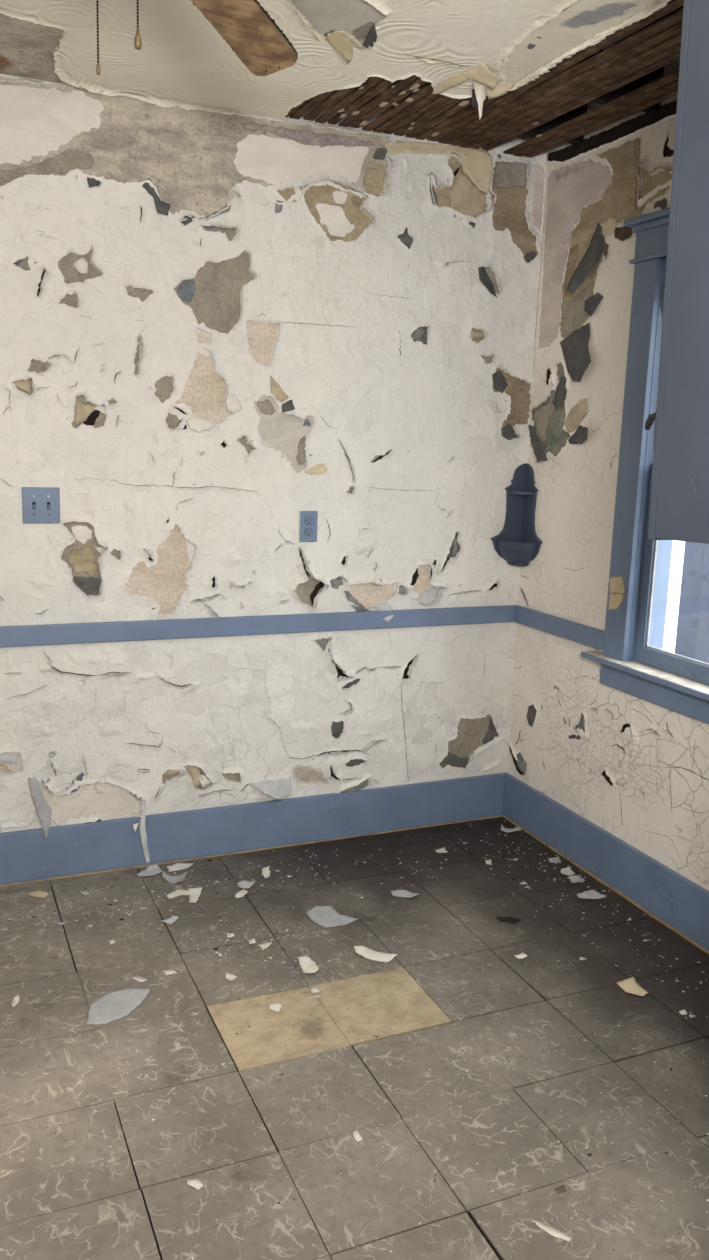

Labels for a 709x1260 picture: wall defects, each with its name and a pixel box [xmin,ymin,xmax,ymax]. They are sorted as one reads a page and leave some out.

crack [405,37,526,83]
peeling [0,0,684,479]
peeling [338,479,358,500]
peeling [54,513,258,620]
peeling [287,528,464,622]
peeling [609,576,626,610]
peeling [307,631,364,696]
peeling [395,650,420,686]
peeling [0,742,291,832]
peeling [322,715,374,793]
peeling [436,707,528,781]
crack [474,649,709,860]